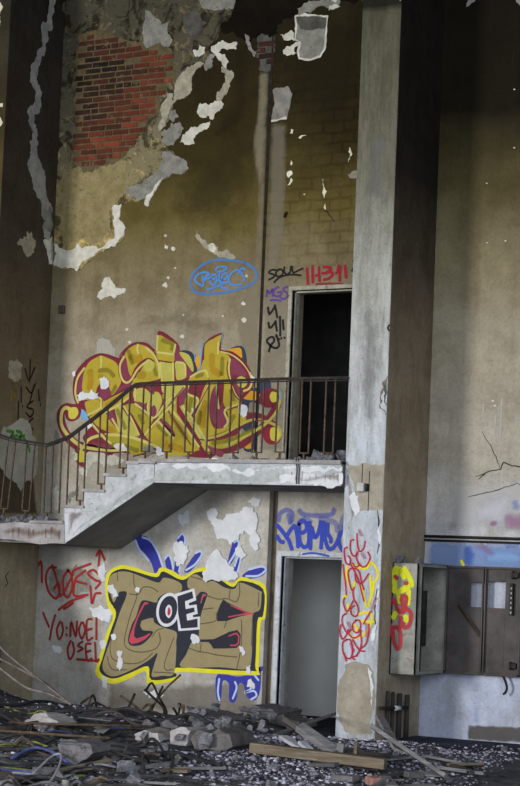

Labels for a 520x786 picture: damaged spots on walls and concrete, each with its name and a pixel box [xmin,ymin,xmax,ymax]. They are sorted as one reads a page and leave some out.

flaking render [17,0,341,271]
peeling [97,277,126,300]
crack [469,432,520,497]
peeling [173,541,189,567]
peeling [202,549,239,583]
peeling [206,496,262,561]